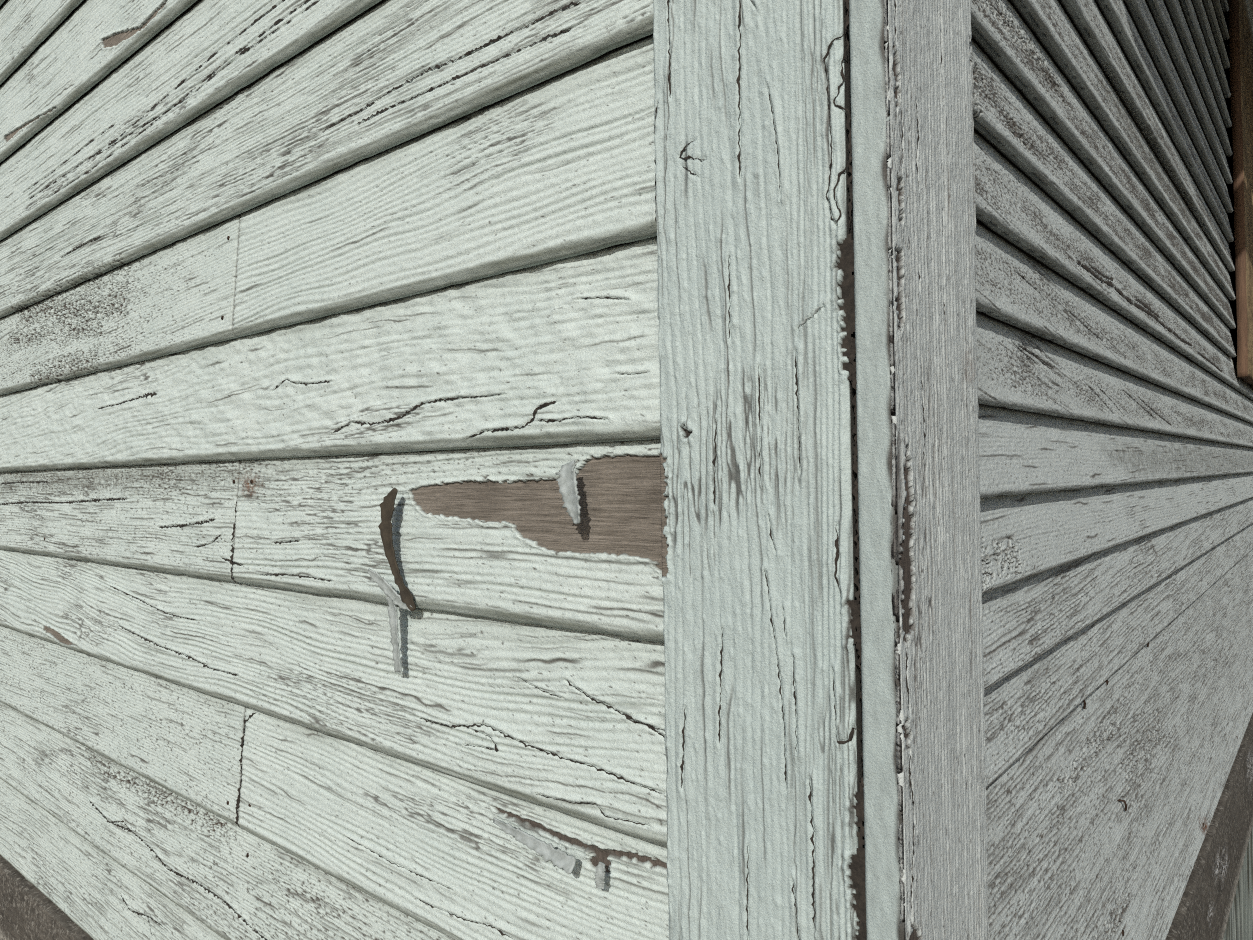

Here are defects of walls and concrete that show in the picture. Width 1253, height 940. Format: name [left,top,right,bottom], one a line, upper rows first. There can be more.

peeling [103,1,167,48]
crack [736,0,781,193]
crack [823,33,851,226]
crack [333,394,500,433]
crack [469,401,607,438]
crack [158,497,331,585]
peeling [412,453,669,576]
peeling [899,456,911,642]
crack [235,713,255,827]
crack [420,678,686,794]
crack [764,519,816,938]
crack [89,800,266,940]